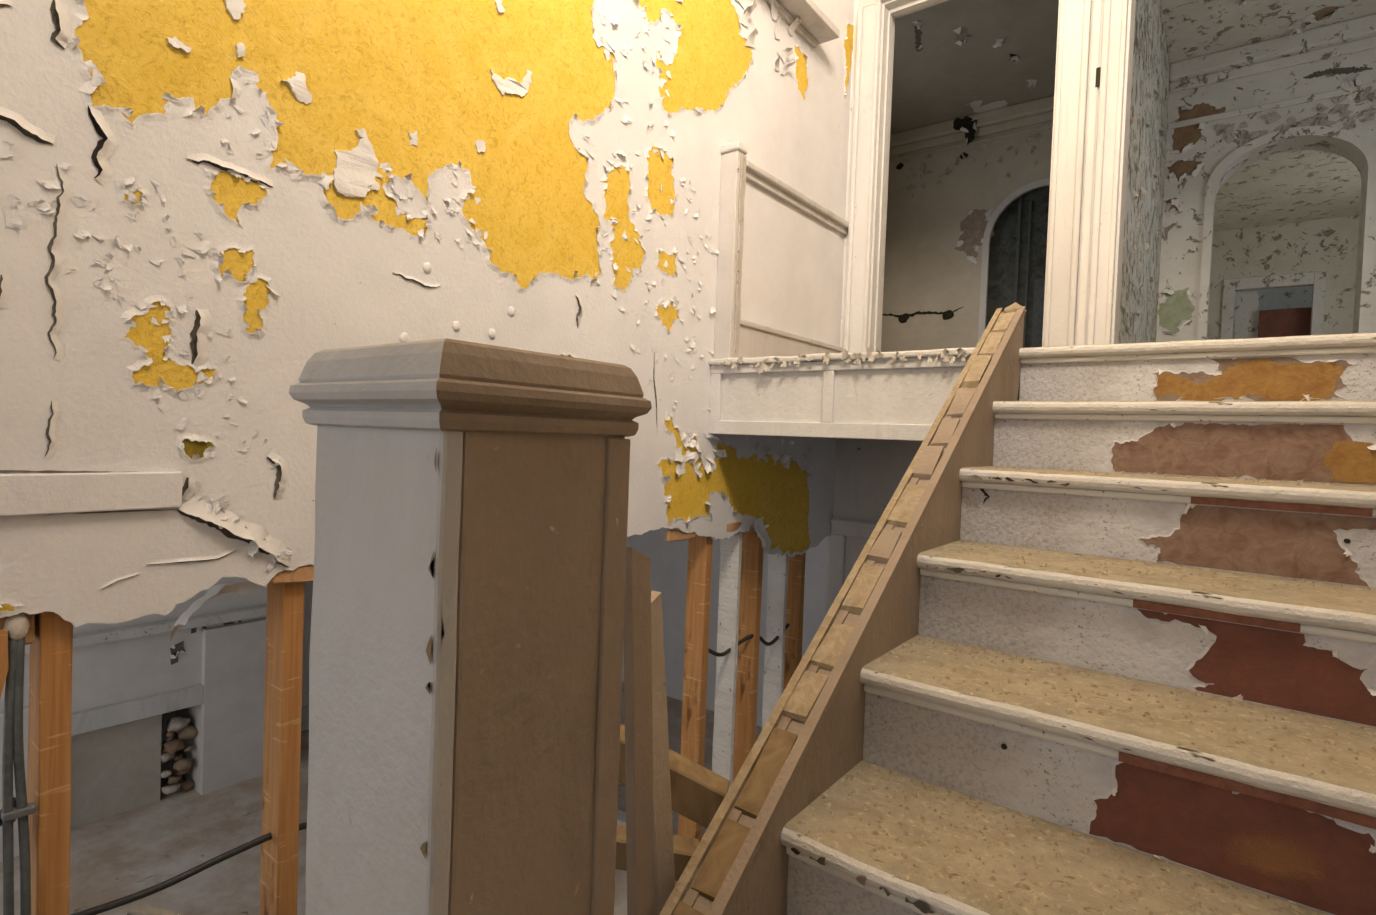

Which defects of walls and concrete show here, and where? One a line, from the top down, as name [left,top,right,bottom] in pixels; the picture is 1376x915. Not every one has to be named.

crack [187,151,273,187]
crack [0,106,118,361]
spalling [954,208,994,264]
peeling [67,0,974,571]
crack [882,307,963,323]
peeling [1151,356,1360,401]
crack [0,401,110,473]
peeling [1109,421,1376,487]
crack [47,477,199,515]
peeling [1137,497,1376,589]
peeling [1133,599,1376,728]
peeling [1079,751,1376,915]